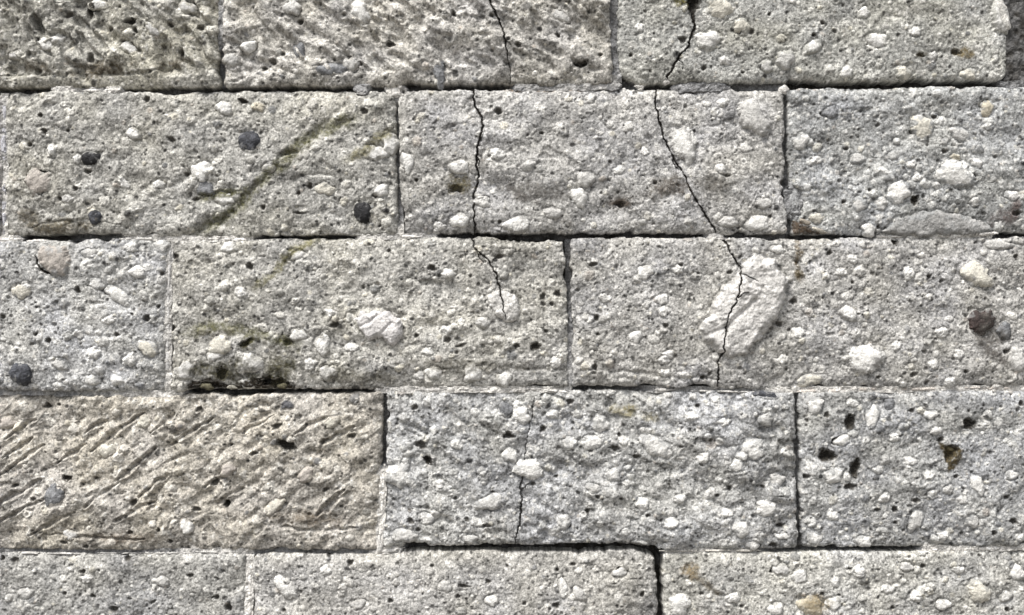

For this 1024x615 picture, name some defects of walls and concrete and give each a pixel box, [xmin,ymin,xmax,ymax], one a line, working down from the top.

crack [489,0,511,82]
crack [471,90,506,317]
crack [654,13,756,387]
crack [515,398,535,543]